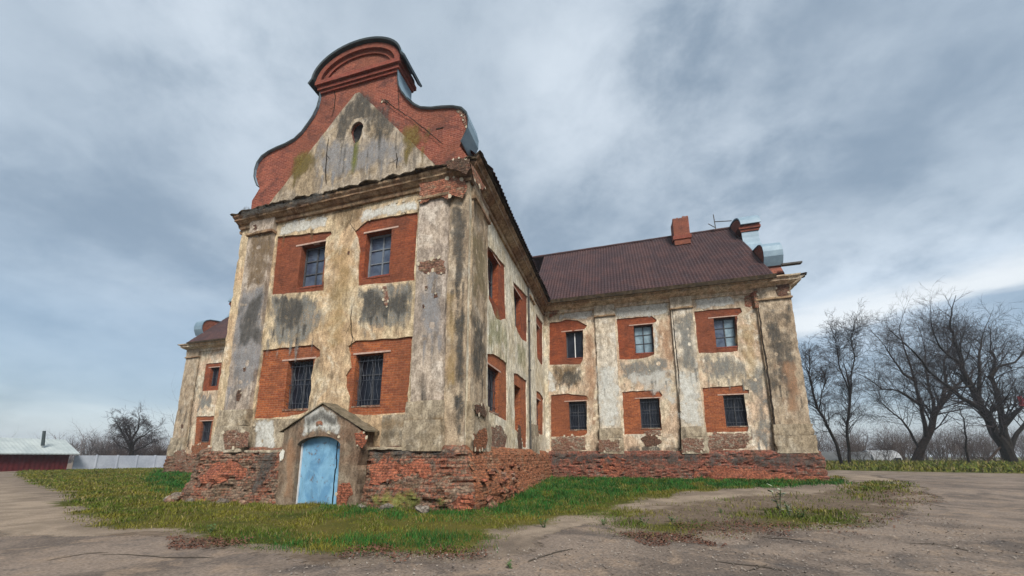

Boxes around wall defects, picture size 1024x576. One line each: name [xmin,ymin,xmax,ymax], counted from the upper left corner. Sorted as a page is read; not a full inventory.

flaking render [174,345,340,489]
damp [228,232,321,394]
damp [242,91,408,217]
spalling [354,430,368,448]
flaking render [347,157,486,309]
damp [358,208,486,394]
flaking render [473,248,824,481]
damp [675,305,820,471]